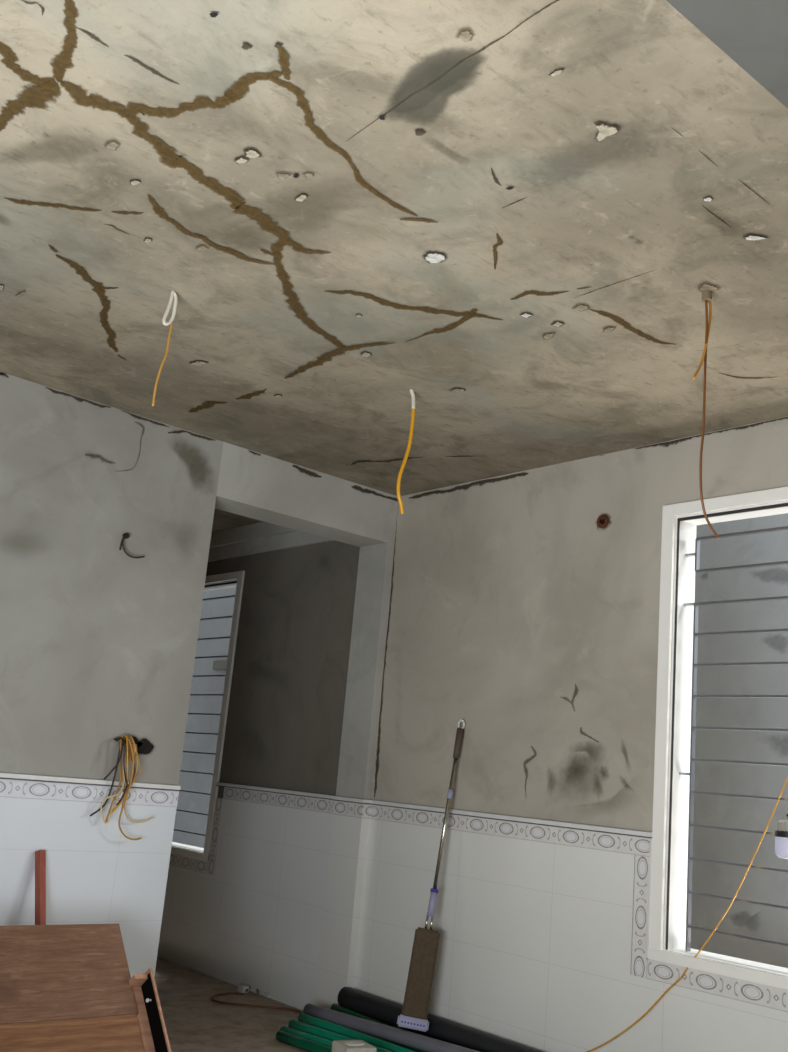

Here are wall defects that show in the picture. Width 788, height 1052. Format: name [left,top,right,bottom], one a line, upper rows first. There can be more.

damp [389,51,479,121]
spalling [595,121,620,141]
spalling [235,147,262,164]
crack [0,0,676,471]
spalling [423,251,447,263]
crack [292,465,322,477]